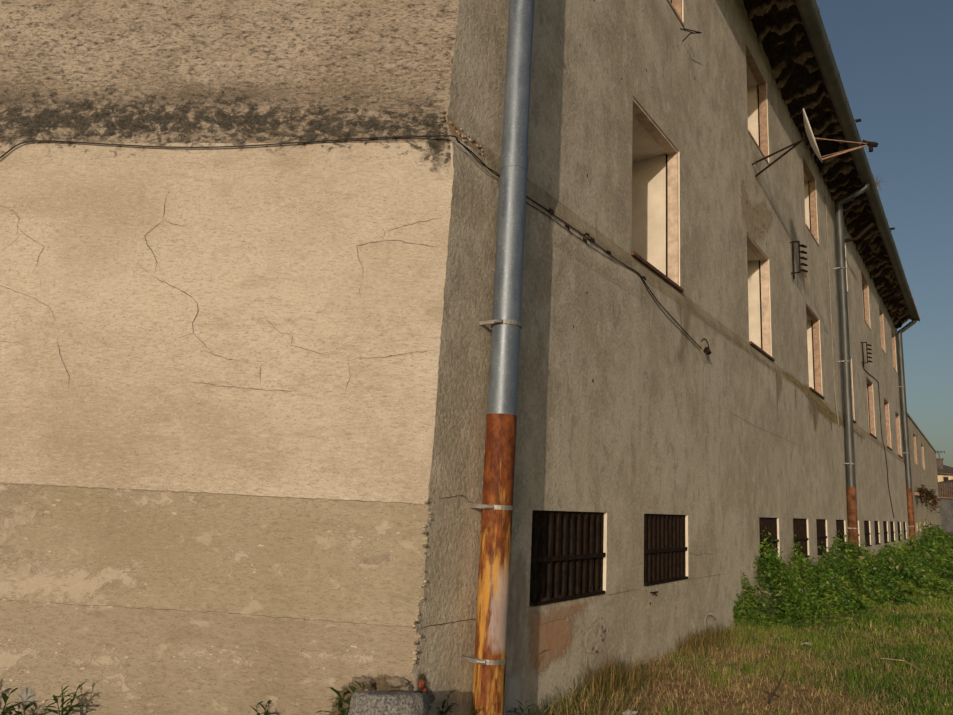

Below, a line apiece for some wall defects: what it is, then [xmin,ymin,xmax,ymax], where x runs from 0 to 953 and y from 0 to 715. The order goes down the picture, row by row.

damp [0,88,451,169]
crack [0,206,53,314]
crack [139,194,233,360]
rust [471,413,517,715]
rust [846,487,859,559]
peeling [528,602,586,672]